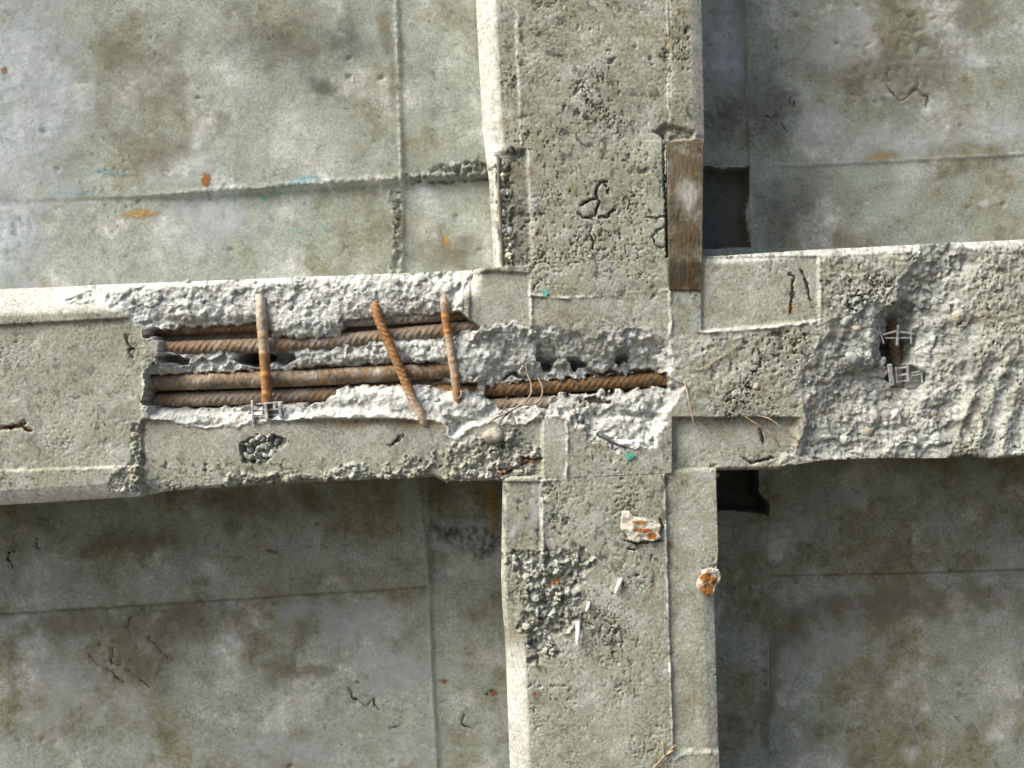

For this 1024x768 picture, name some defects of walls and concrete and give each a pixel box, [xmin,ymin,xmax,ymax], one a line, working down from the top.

crack [579,181,616,250]
crack [648,138,667,260]
crack [0,422,32,432]
spalling [63,271,687,465]
spalling [777,242,989,467]
crack [88,616,173,687]